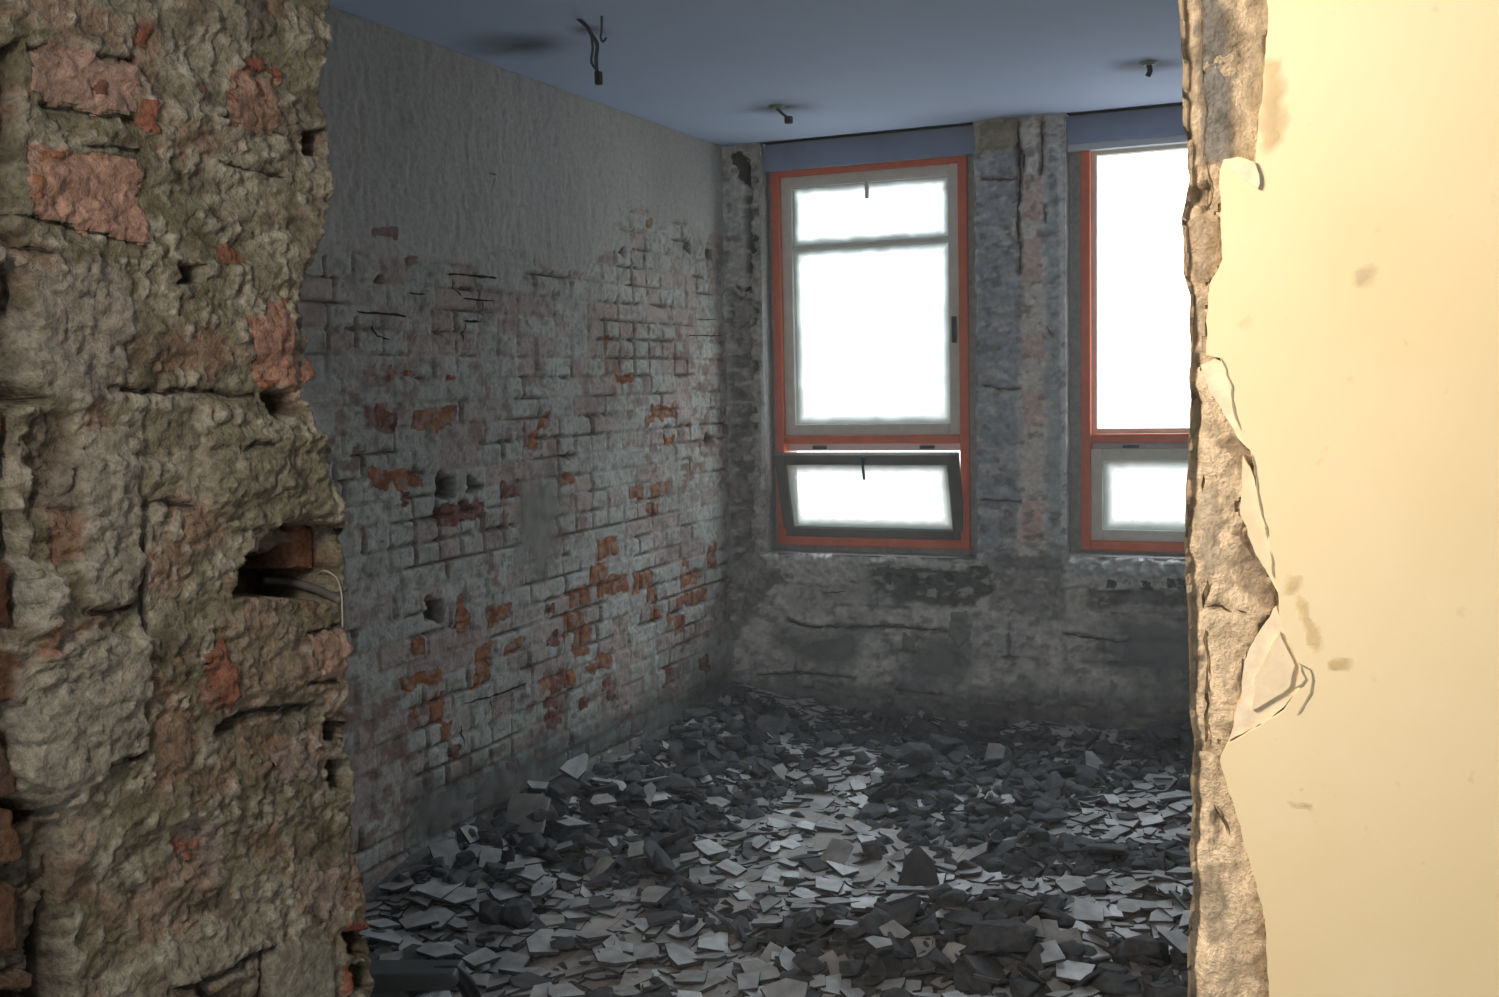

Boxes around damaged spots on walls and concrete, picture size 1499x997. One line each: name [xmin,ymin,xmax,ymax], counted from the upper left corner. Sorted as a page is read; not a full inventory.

flaking render [29,40,162,134]
flaking render [26,143,150,246]
crack [984,121,1046,271]
crack [112,384,255,397]
spalling [428,478,520,527]
spalling [1180,0,1300,997]
crack [307,623,340,634]
flaking render [306,627,354,683]
spalling [454,593,526,691]
spalling [539,536,717,730]
crack [215,679,337,730]
crack [112,751,147,767]